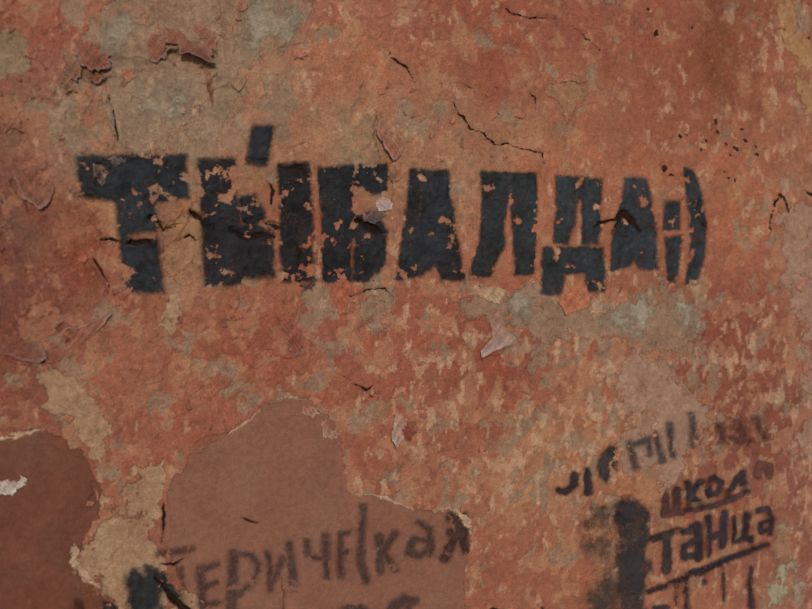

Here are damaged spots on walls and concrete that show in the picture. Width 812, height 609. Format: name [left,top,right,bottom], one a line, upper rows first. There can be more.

peeling [0,24,39,81]
peeling [45,0,315,186]
peeling [71,186,125,245]
peeling [362,196,393,224]
crack [770,193,790,224]
peeling [151,201,212,335]
peeling [331,268,391,342]
peeling [455,272,729,493]
peeling [35,362,113,464]
peeling [392,408,419,449]
peeling [0,475,27,496]
crack [154,559,190,609]